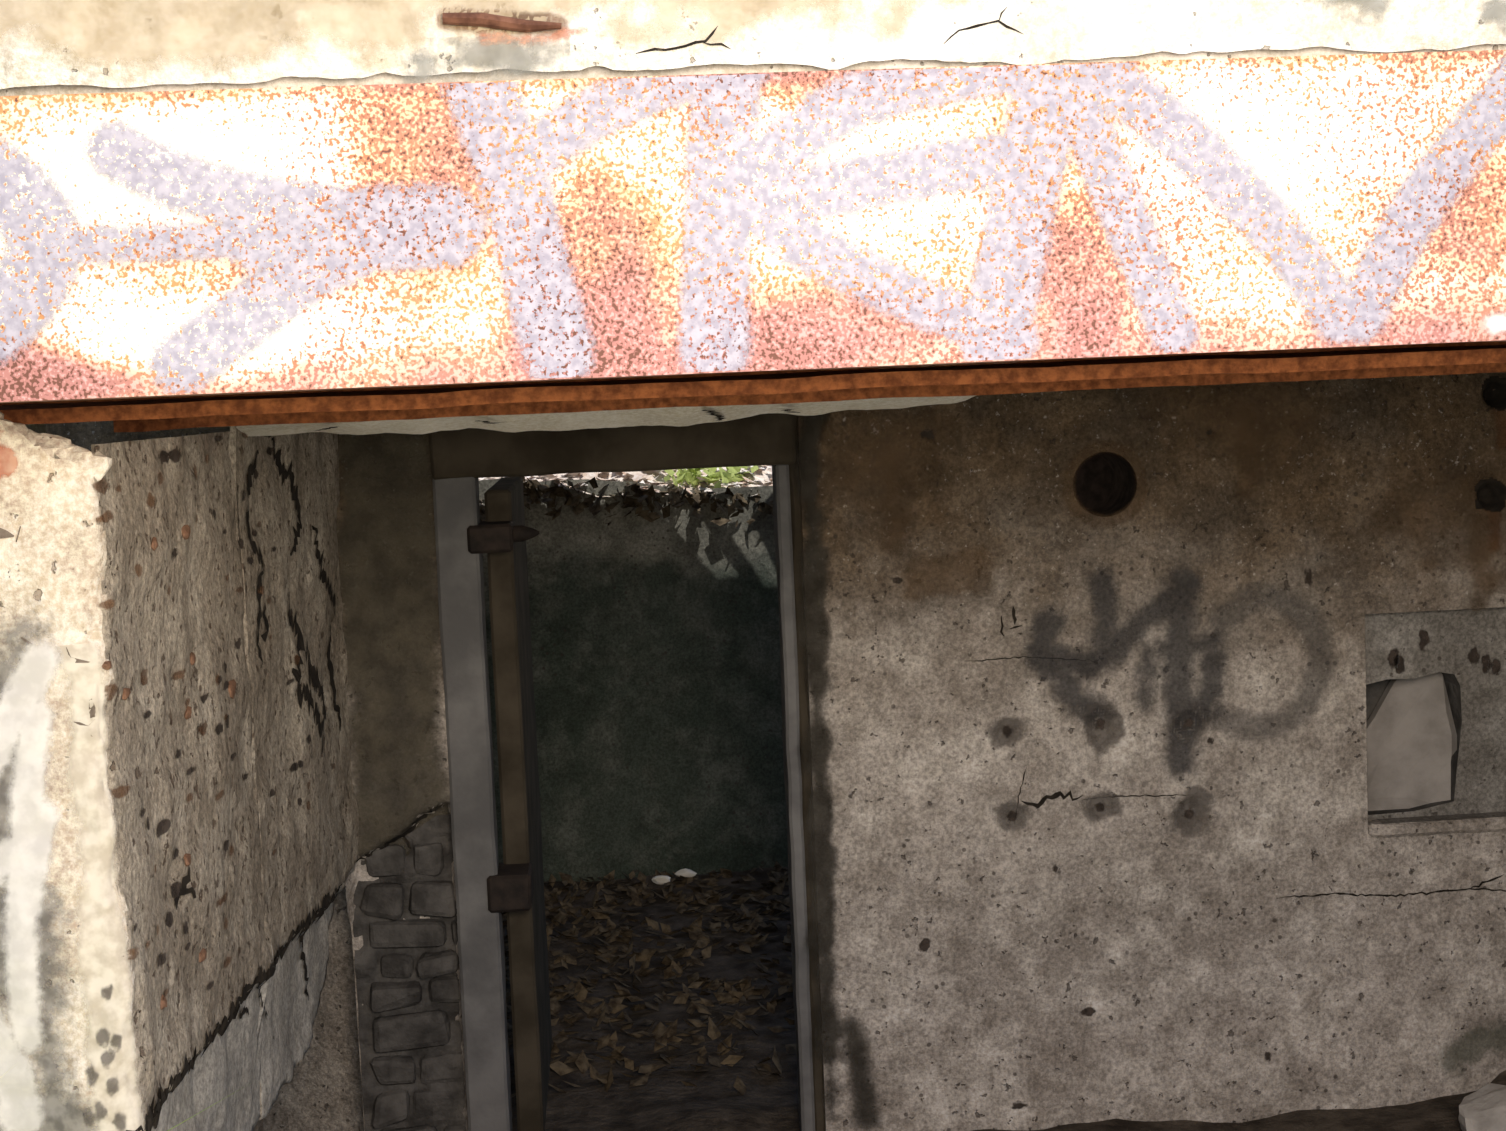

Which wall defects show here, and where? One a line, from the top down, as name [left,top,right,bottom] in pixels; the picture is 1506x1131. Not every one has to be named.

corrosion [0,445,17,478]
crack [126,806,439,1131]